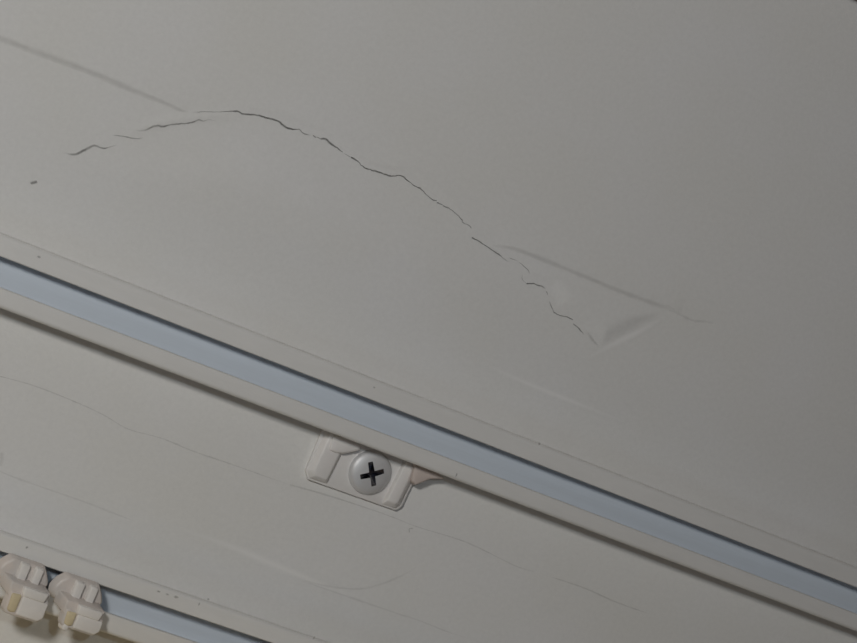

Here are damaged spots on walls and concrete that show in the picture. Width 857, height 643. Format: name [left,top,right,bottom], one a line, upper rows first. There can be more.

crack [125,105,240,139]